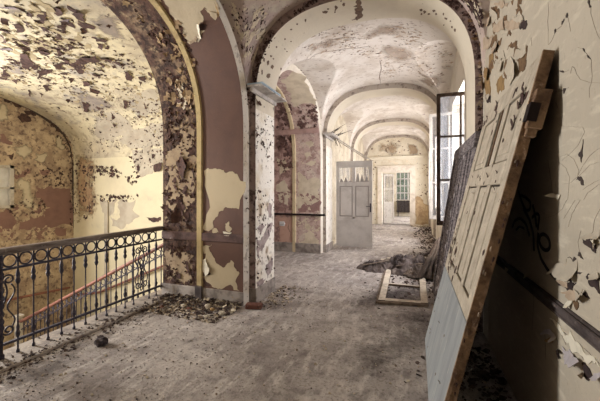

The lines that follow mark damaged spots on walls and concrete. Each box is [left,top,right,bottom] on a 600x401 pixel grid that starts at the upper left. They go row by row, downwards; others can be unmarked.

crack [547,5,571,44]
peeling [443,0,529,131]
crack [556,47,592,108]
peeling [0,0,220,241]
flaking render [203,2,322,287]
crack [550,123,600,252]
peeling [580,230,600,253]
peeling [546,252,600,310]
peeling [550,318,600,381]